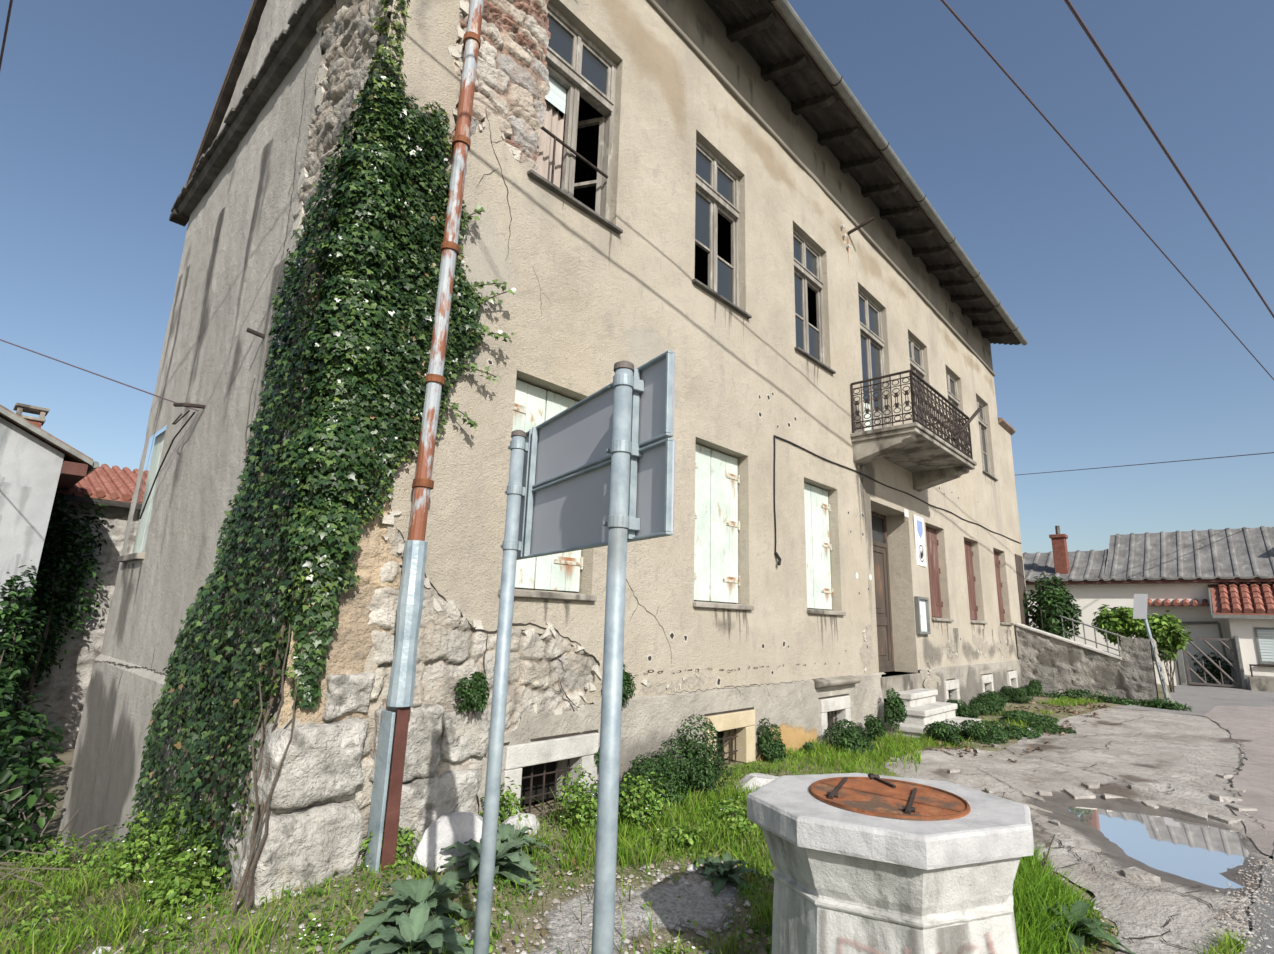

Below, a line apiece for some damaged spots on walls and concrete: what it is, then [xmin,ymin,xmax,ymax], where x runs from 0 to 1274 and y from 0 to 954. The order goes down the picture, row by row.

spalling [447,0,551,171]
crack [476,112,512,262]
spalling [277,0,405,868]
spalling [410,576,602,741]
crack [626,579,806,703]
spalling [433,737,488,777]
crack [967,716,1264,954]